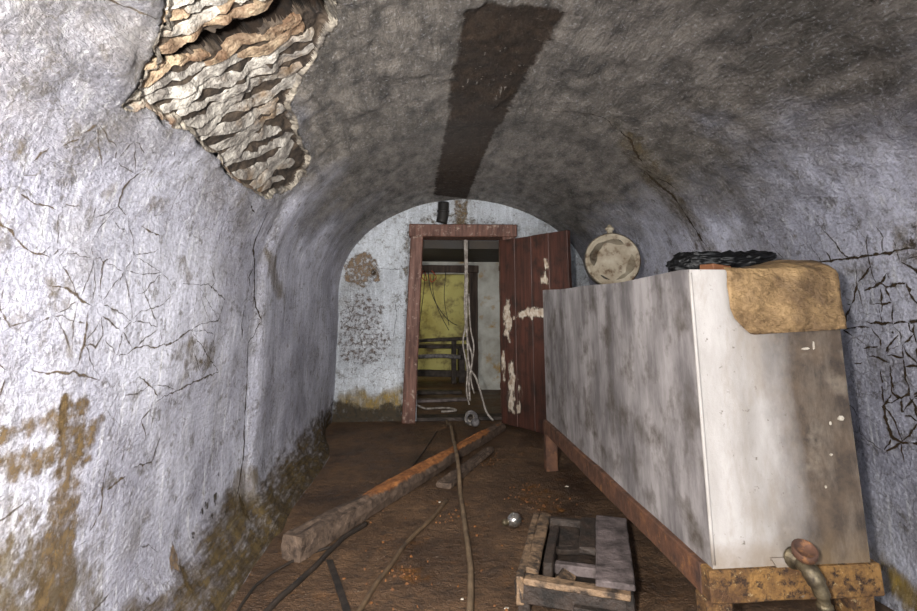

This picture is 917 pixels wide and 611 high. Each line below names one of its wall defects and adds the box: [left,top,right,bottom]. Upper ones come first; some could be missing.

spalling [121,0,338,200]
crack [0,125,273,530]
leakage [339,252,390,364]
crack [810,223,917,461]
leakage [0,395,105,611]